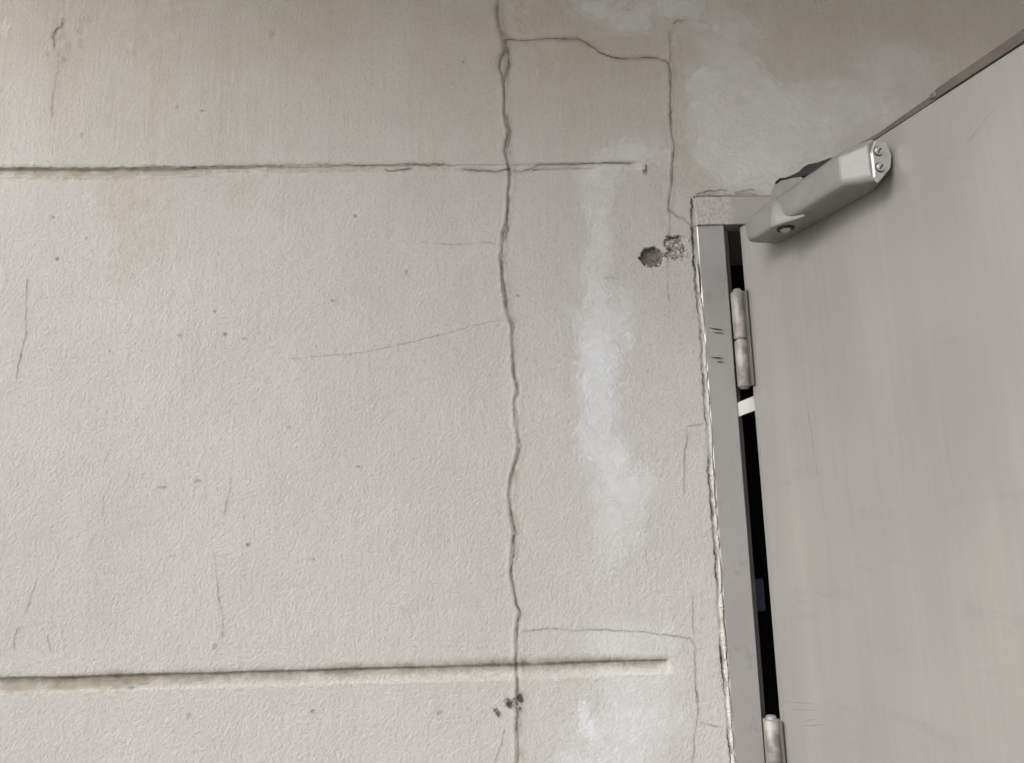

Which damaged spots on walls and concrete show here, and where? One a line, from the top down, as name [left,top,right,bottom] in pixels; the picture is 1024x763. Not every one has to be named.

crack [470,11,756,425]
crack [109,672,168,680]
crack [312,666,365,674]
crack [443,510,635,760]
spalling [638,235,736,763]
crack [707,457,731,763]